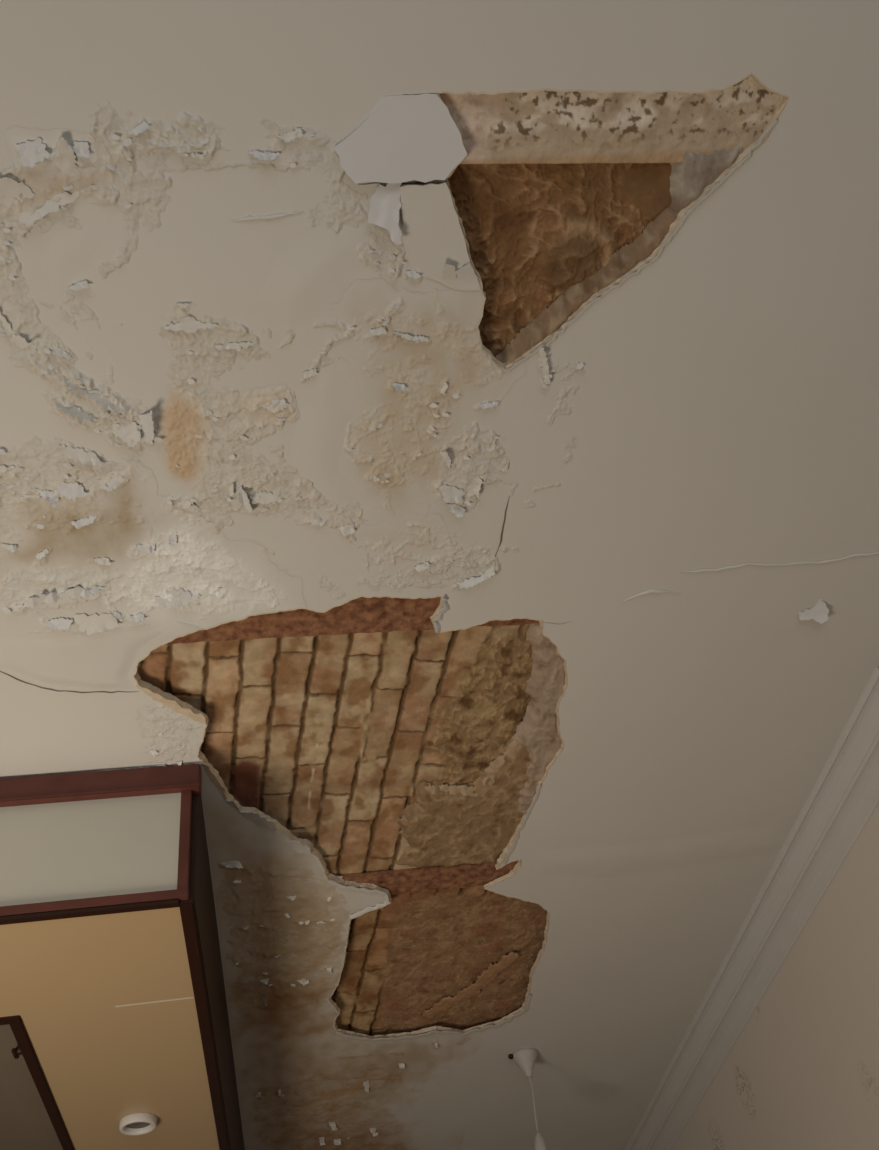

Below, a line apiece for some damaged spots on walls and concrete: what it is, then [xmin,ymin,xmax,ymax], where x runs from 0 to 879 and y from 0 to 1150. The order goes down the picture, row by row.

peeling [0,101,423,552]
flaking render [437,73,789,373]
crack [0,671,139,693]
peeling [0,549,146,637]
flaking render [89,300,568,1048]
peeling [319,1122,350,1145]